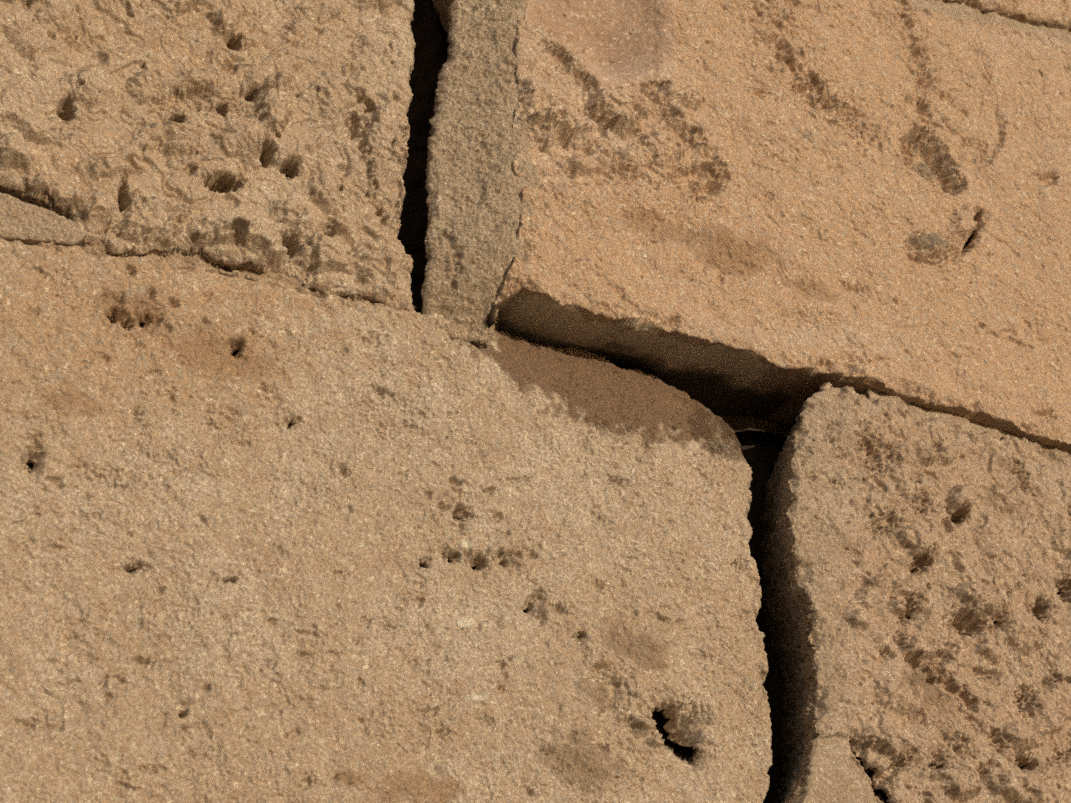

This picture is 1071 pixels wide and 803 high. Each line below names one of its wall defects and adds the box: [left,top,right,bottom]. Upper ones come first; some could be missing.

crack [748,0,881,146]
crack [895,0,936,130]
crack [397,0,449,314]
crack [929,206,990,269]
crack [487,304,498,328]
crack [719,415,793,803]
crack [844,728,899,803]